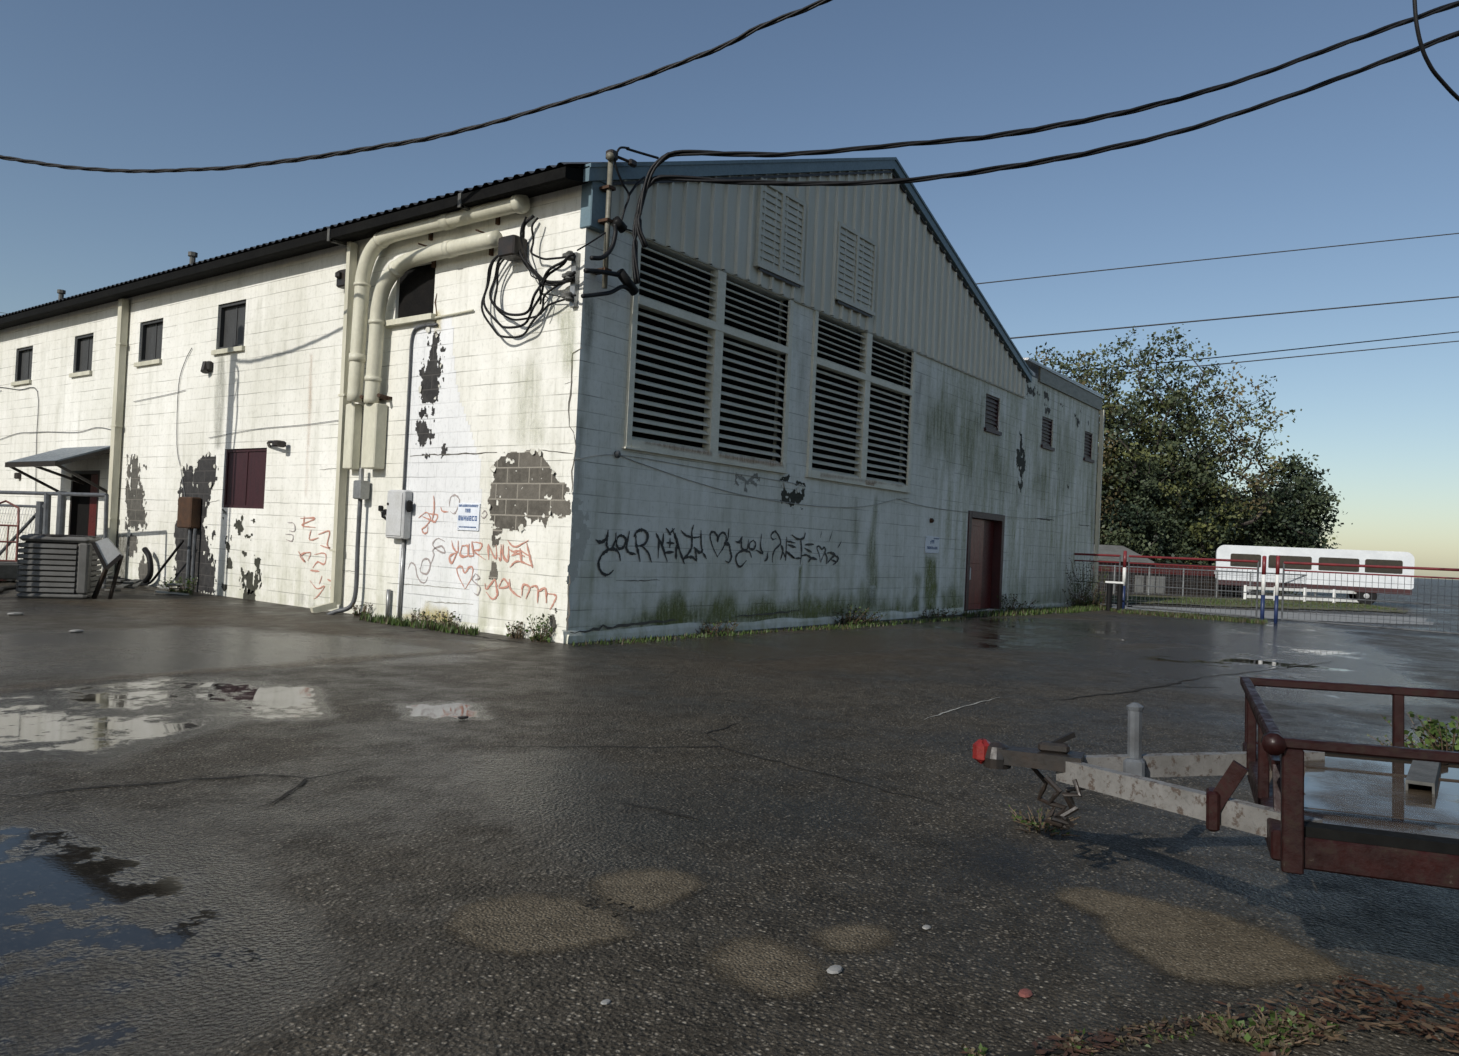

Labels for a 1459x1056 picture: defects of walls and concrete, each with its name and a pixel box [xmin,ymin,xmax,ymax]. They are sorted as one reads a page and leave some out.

peeling [415,327,448,459]
peeling [125,454,148,580]
peeling [174,451,262,600]
peeling [487,448,591,584]
peeling [780,474,806,510]
peeling [1016,432,1026,492]